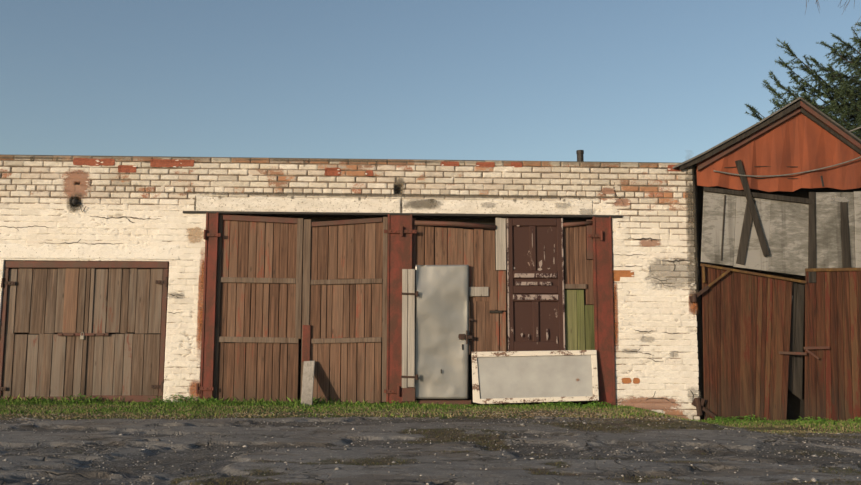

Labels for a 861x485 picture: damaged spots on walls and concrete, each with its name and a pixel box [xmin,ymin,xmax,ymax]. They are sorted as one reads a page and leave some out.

peeling [64,158,137,198]
spalling [150,159,194,167]
spalling [324,168,341,176]
peeling [600,188,631,206]
spalling [616,397,681,410]
crack [556,422,750,485]